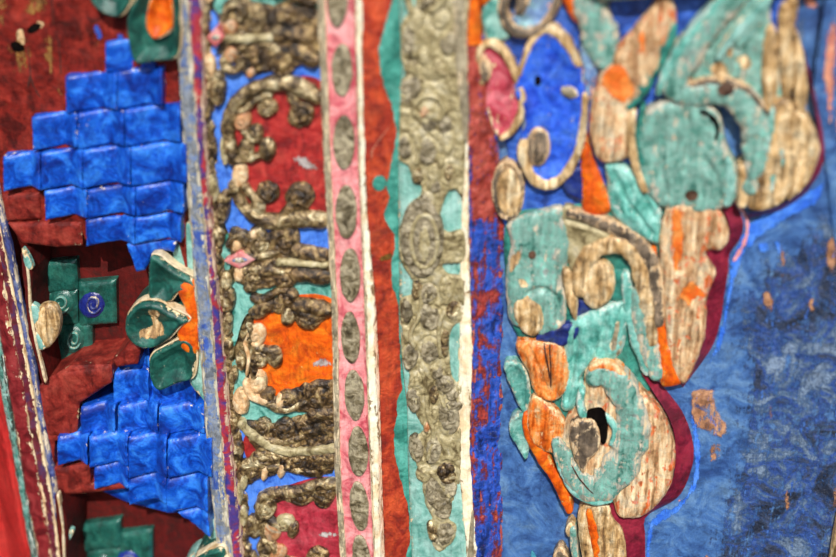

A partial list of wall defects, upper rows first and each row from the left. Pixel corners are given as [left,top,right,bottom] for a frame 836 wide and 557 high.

peeling [8,0,47,72]
peeling [600,64,634,103]
peeling [671,208,684,271]
peeling [678,282,706,306]
peeling [706,180,836,557]
peeling [646,389,730,557]